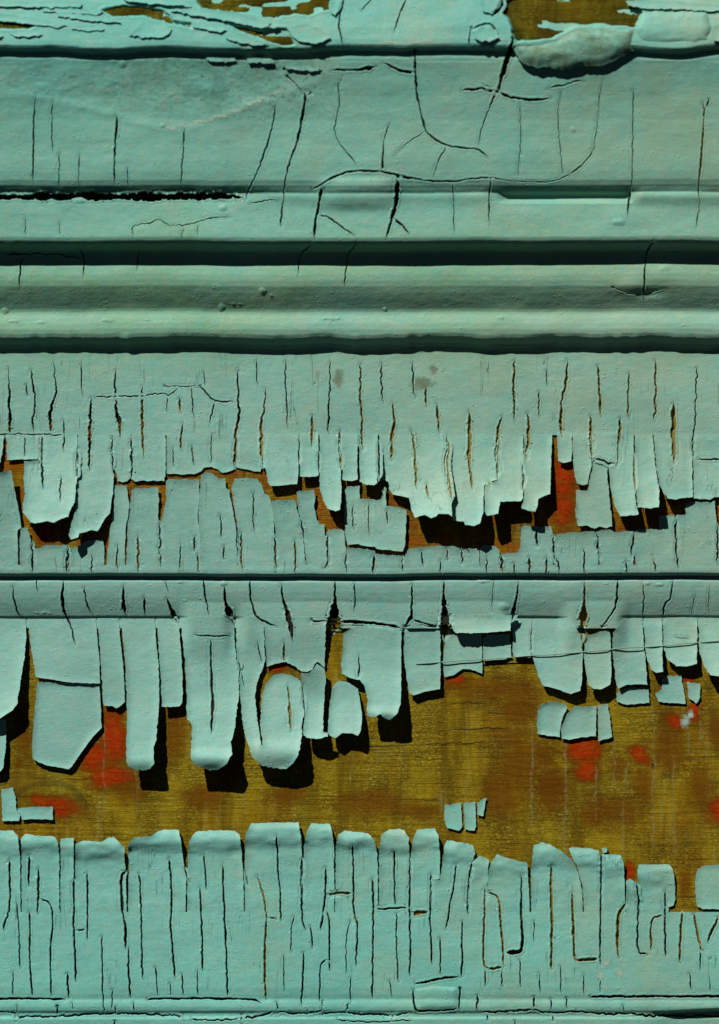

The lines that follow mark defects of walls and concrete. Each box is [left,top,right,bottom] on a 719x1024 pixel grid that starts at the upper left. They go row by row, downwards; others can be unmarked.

peeling [0,0,343,72]
peeling [472,0,719,42]
crack [0,0,603,290]
crack [624,86,637,218]
crack [694,98,712,230]
peeling [0,430,719,569]
crack [0,357,719,735]
peeling [0,614,719,771]
peeling [0,788,675,914]
crack [0,835,719,1024]
peeling [695,865,719,910]